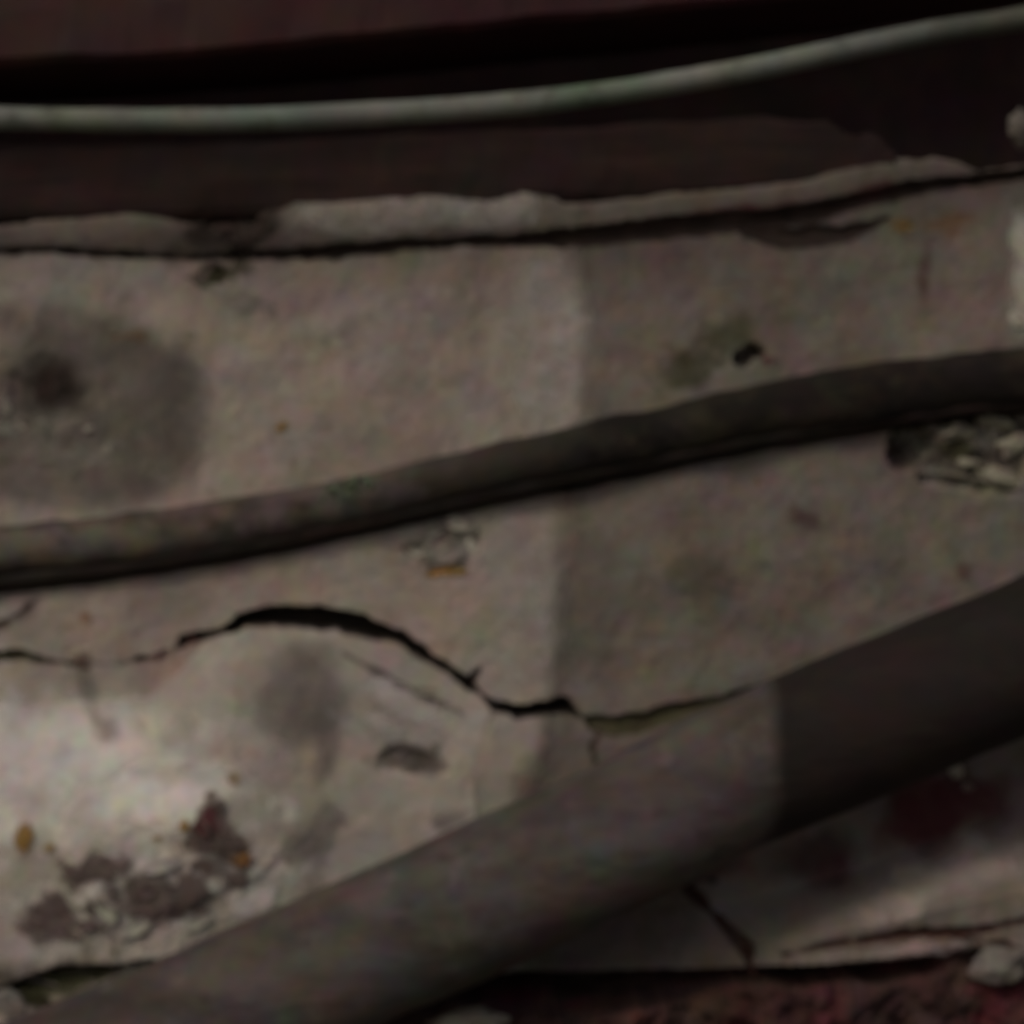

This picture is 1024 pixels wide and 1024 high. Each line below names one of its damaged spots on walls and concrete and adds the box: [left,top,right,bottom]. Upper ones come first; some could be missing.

damp [0,320,184,500]
spalling [924,415,1024,490]
crack [0,601,88,666]
spalling [376,718,438,772]
crack [176,605,754,765]
peeling [14,791,249,952]